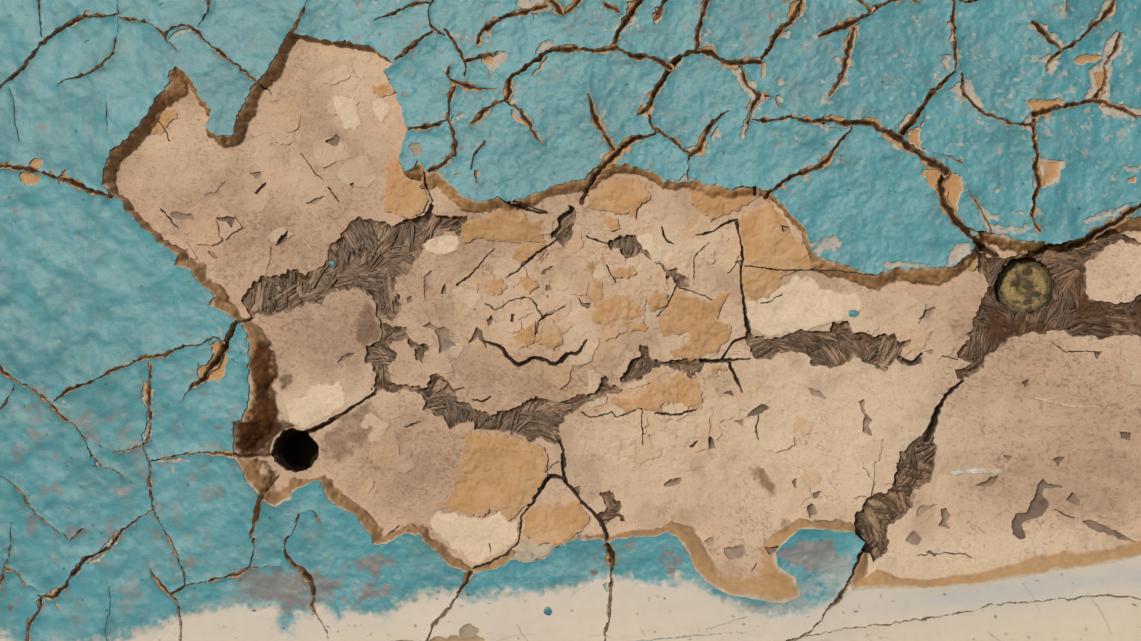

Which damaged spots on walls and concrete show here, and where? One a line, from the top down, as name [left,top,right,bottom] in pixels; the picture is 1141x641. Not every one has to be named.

crack [290,1,307,34]
crack [0,0,272,199]
crack [374,0,1141,258]
peeling [116,37,1141,603]
peeling [29,453,259,641]
crack [0,316,328,641]
rust [232,341,294,483]
peeling [173,481,465,630]
crack [425,568,475,641]
peeling [429,623,485,641]
crack [603,542,617,641]
crack [786,551,1141,641]